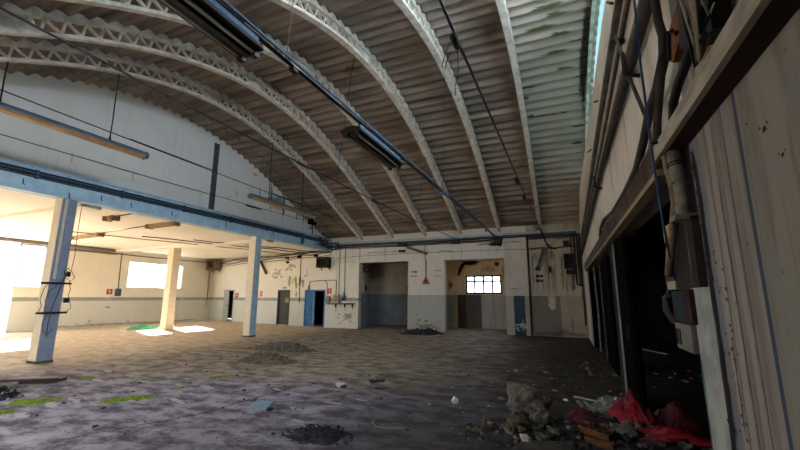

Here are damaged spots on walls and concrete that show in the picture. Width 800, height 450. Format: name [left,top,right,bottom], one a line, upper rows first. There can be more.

damp [526,0,591,112]